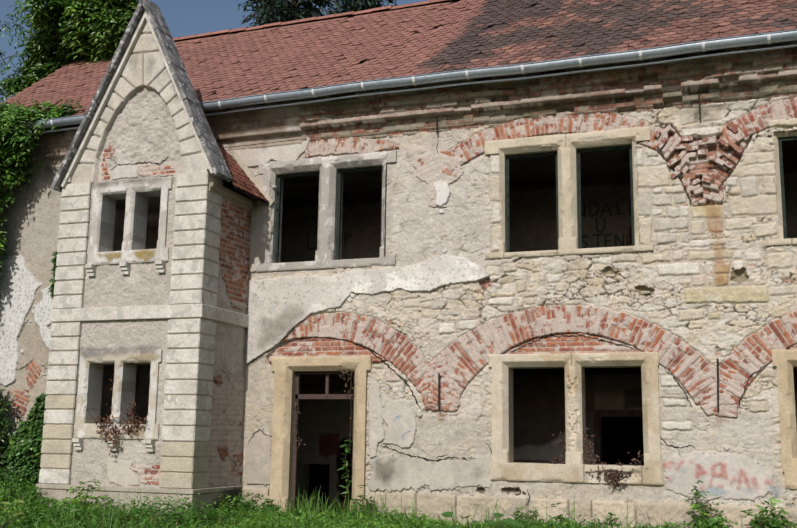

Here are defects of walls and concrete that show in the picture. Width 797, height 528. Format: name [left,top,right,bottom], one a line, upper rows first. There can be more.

spalling [101,145,175,180]
crack [110,157,168,170]
spalling [654,123,751,207]
peeling [218,134,492,365]
spalling [599,265,621,281]
peeling [0,254,53,418]
spalling [207,374,245,487]
crack [379,443,492,461]
peeling [106,459,161,487]